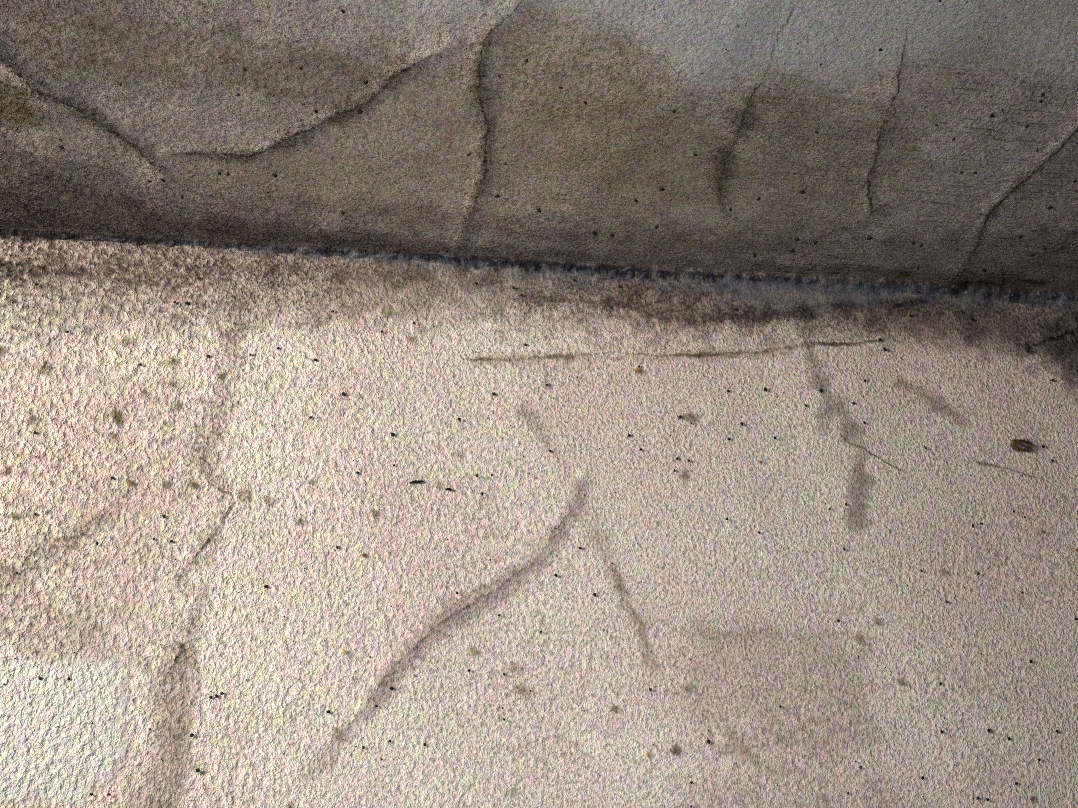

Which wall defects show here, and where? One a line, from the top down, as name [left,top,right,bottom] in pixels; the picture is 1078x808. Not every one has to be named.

crack [0,56,156,166]
crack [187,62,420,160]
crack [470,20,504,214]
crack [714,87,759,196]
crack [867,39,907,213]
crack [978,129,1078,244]
water stain [0,175,817,342]
water stain [827,268,1078,381]